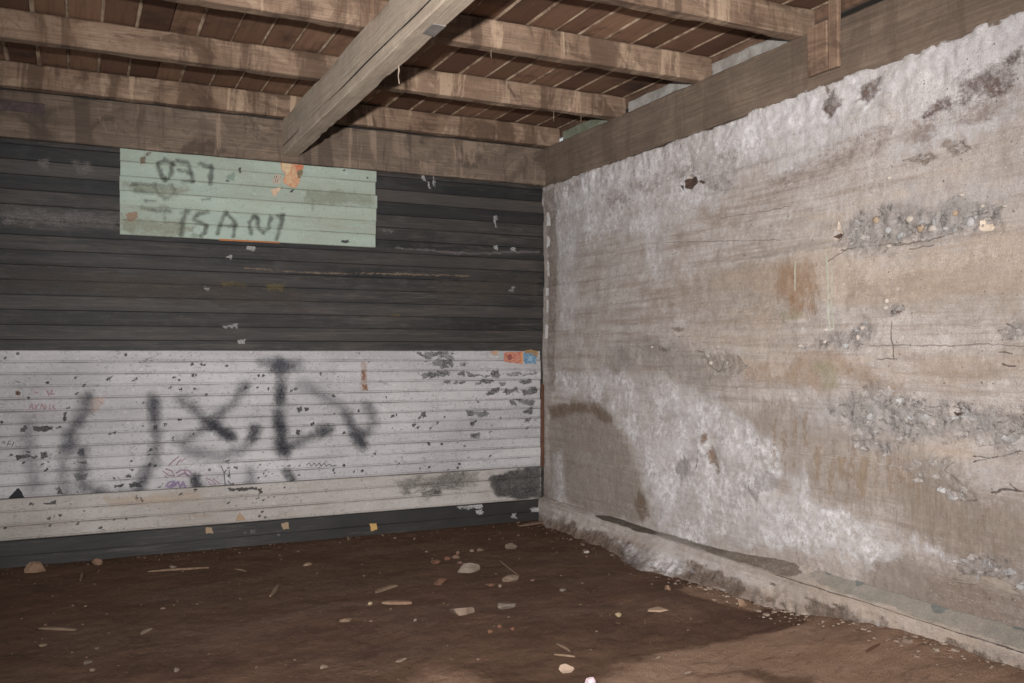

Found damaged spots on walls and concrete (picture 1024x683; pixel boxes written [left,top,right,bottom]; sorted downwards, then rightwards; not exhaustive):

spalling [837,193,1008,255]
crack [869,322,904,360]
crack [932,324,1020,367]
peeling [413,351,537,447]
spalling [827,384,1024,457]
damp [550,369,893,562]